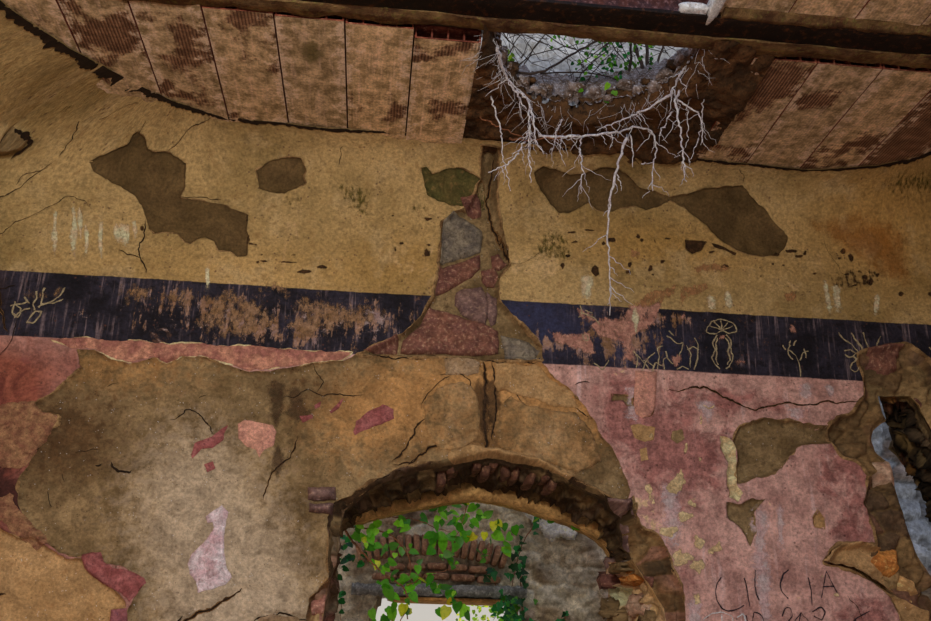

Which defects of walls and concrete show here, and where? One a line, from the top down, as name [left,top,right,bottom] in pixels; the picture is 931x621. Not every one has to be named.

spalling [503,48,698,105]
spalling [534,166,788,257]
crack [287,364,364,398]
spalling [0,132,722,621]
crack [363,355,539,481]
crack [263,436,298,499]
spalling [720,417,831,546]
crack [669,341,931,621]
crack [177,588,242,621]
spalling [891,597,929,621]